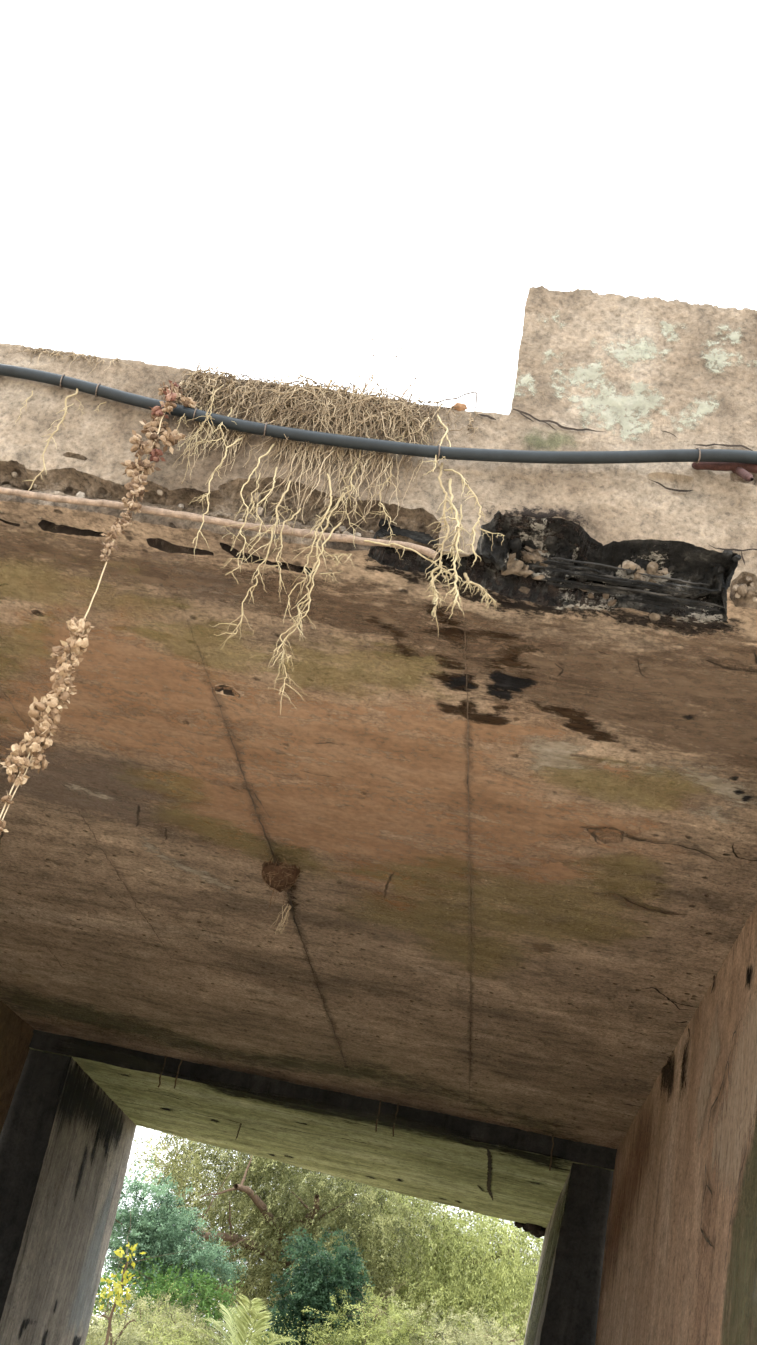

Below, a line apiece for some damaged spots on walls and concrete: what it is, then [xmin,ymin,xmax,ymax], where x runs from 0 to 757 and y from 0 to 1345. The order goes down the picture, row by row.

crack [174,583,348,1073]
spalling [0,452,757,627]
damp [0,525,757,826]
crack [463,604,532,1098]